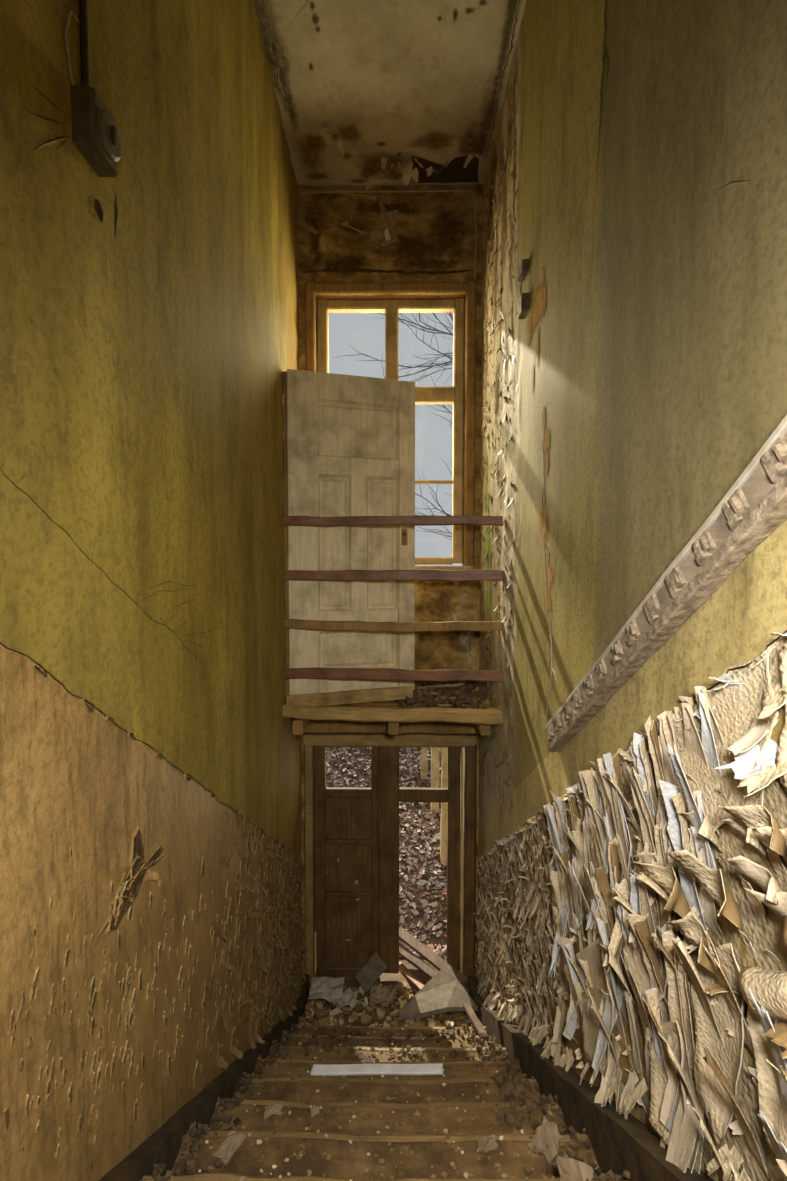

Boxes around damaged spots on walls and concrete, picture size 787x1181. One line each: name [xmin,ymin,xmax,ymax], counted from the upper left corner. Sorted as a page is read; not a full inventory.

crack [0,467,222,663]
peeling [7,824,242,1145]
peeling [473,628,787,1181]